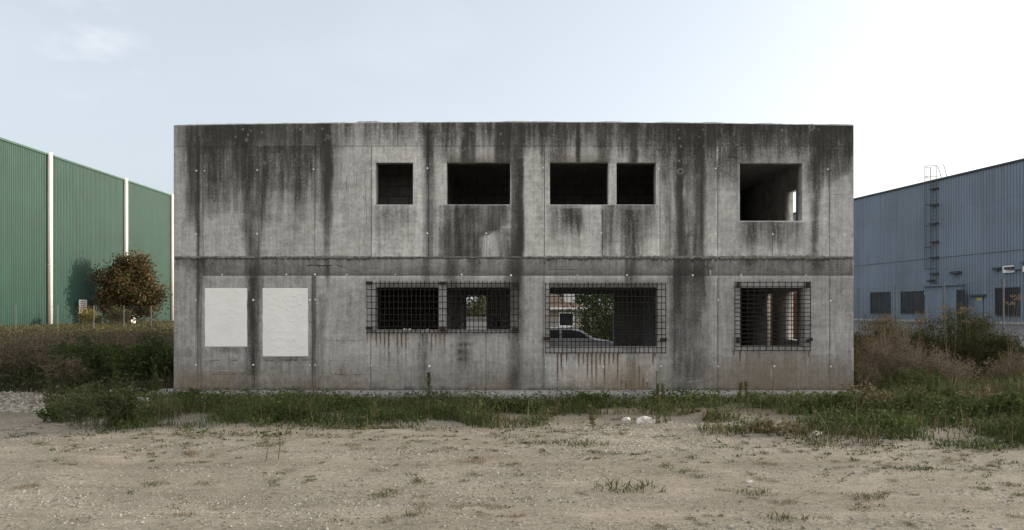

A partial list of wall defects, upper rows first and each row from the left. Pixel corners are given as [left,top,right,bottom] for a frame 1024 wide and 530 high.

leakage [183,123,350,375]
rust [557,353,657,387]
leakage [423,122,853,375]